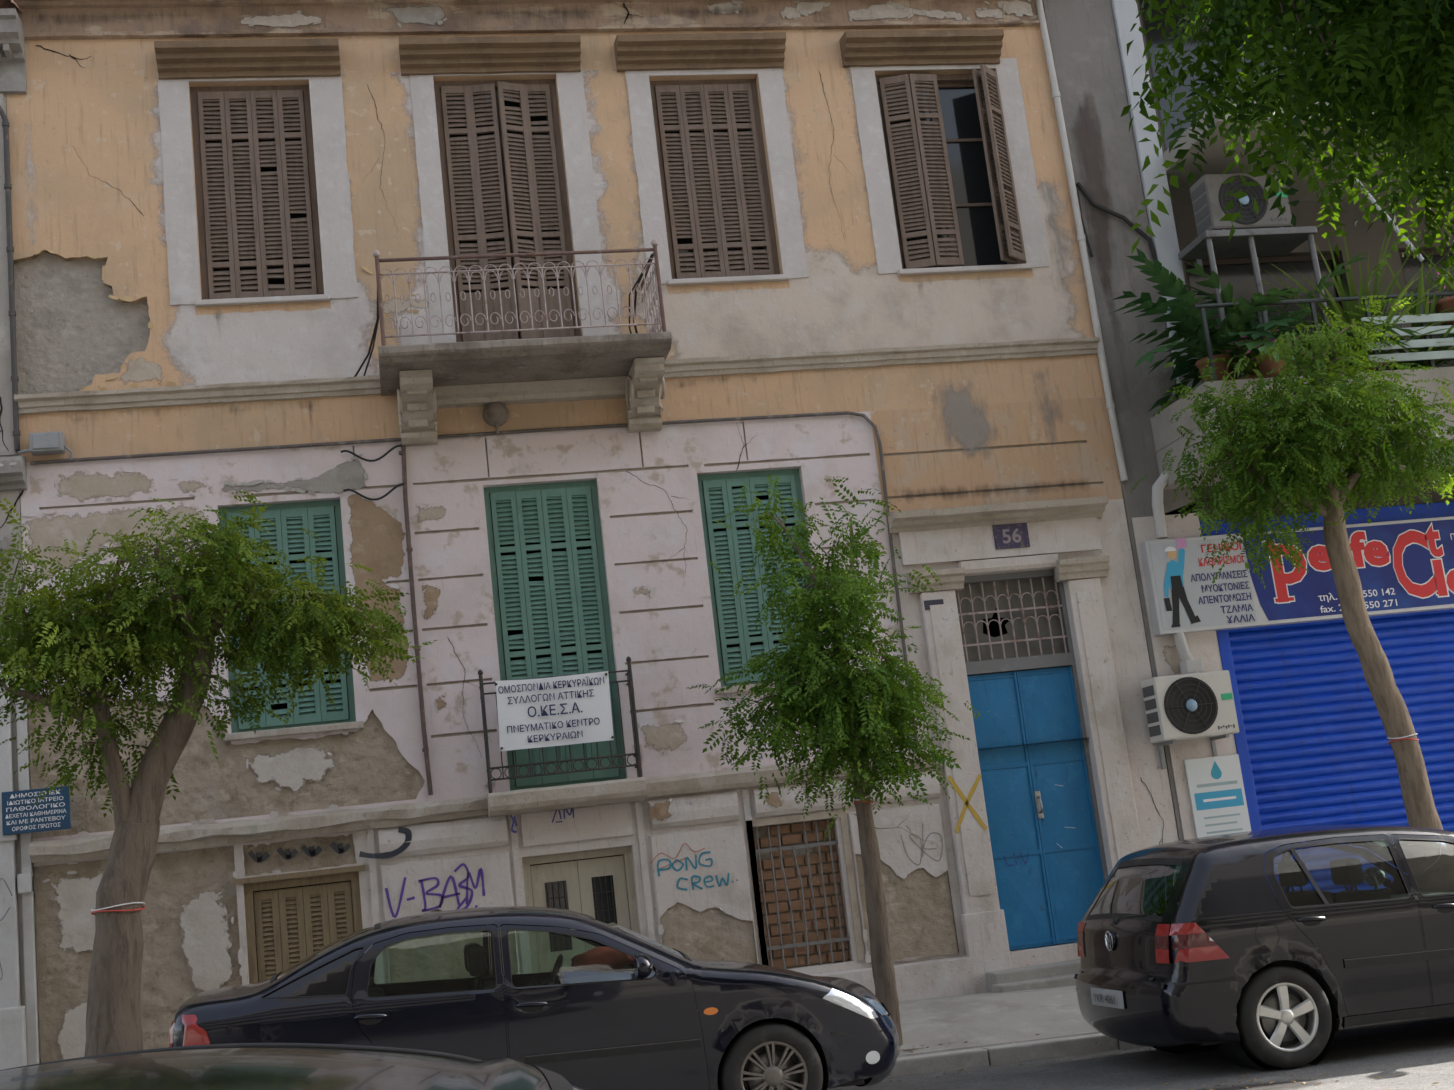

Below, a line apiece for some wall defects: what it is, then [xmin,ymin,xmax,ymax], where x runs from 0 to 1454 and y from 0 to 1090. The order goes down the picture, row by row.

peeling [582,70,1084,359]
spalling [13,219,433,394]
peeling [345,488,446,687]
spalling [28,694,115,839]
spalling [107,697,171,788]
spalling [159,705,425,826]
spalling [33,859,108,1063]
spalling [140,833,357,1050]
spalling [658,902,758,964]
spalling [855,854,959,964]